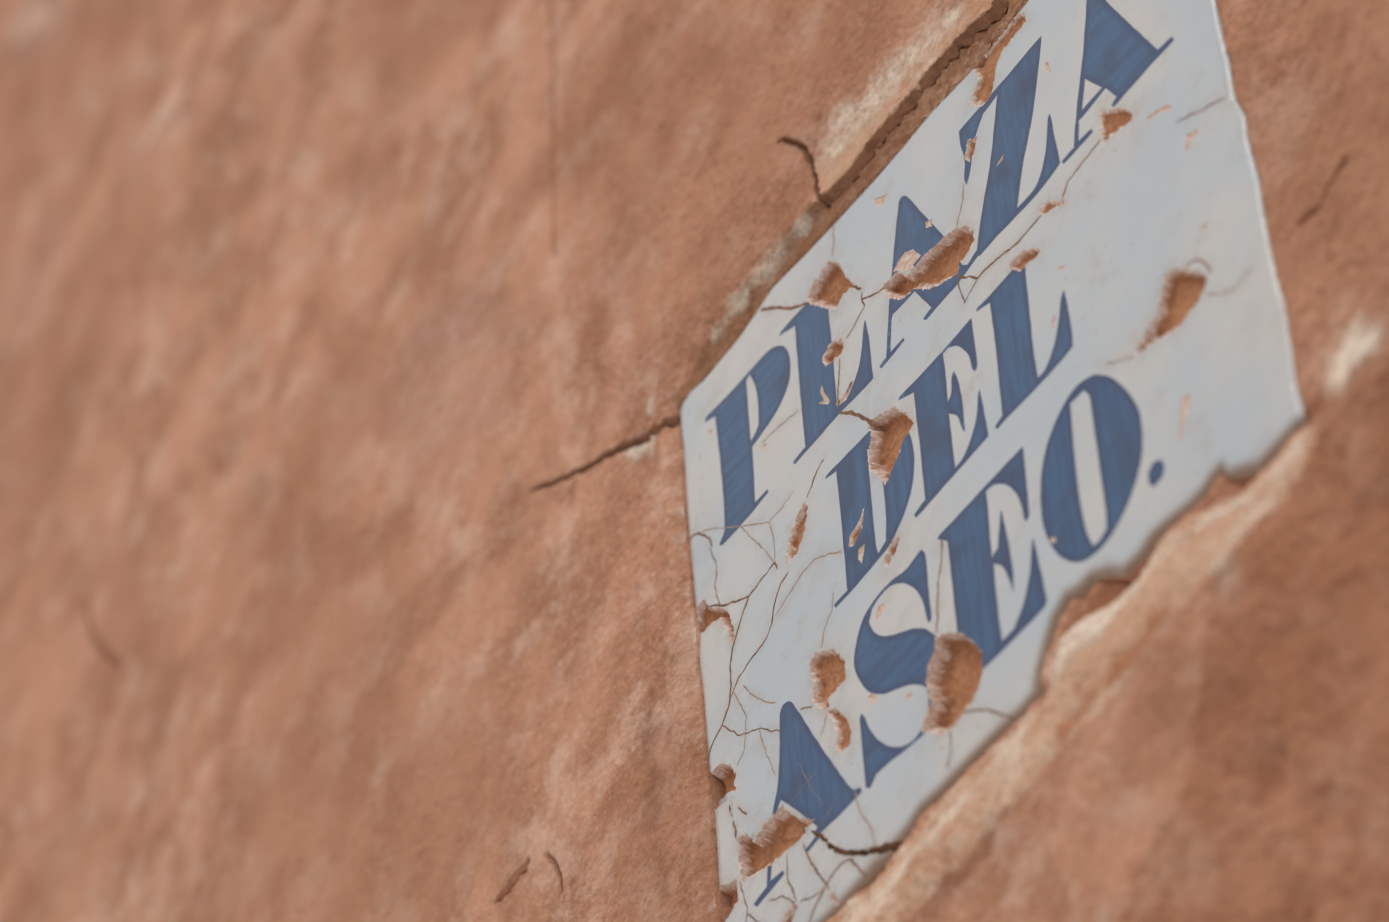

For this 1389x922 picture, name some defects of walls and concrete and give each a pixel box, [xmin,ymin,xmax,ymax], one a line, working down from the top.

crack [778,0,1008,256]
spalling [670,0,1027,410]
crack [837,285,884,424]
crack [957,139,1101,304]
spalling [1134,267,1207,356]
crack [1186,259,1251,296]
crack [534,416,681,491]
crack [690,459,904,922]
spalling [809,648,851,755]
spalling [905,631,983,736]
spalling [1118,350,1389,922]
spalling [720,804,814,922]